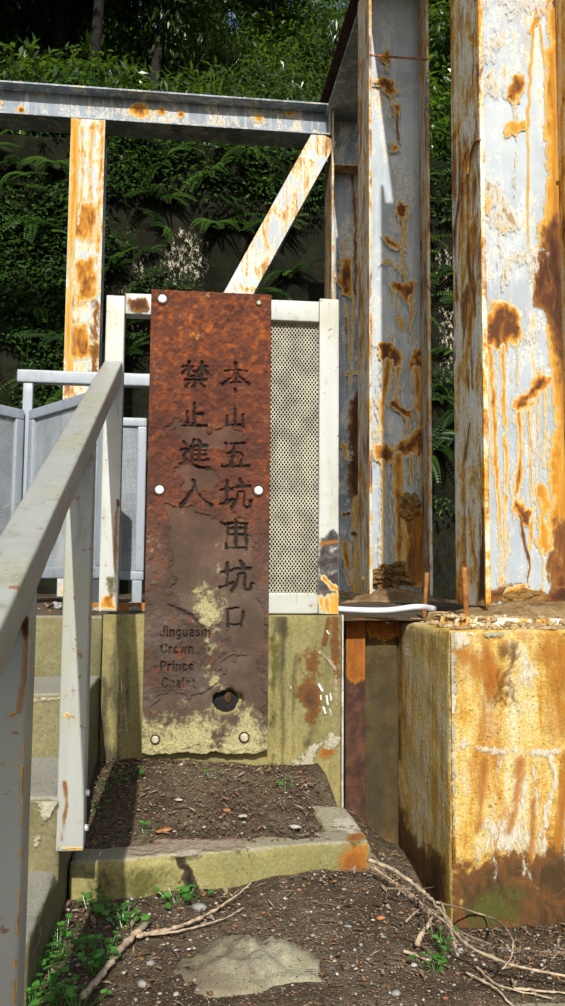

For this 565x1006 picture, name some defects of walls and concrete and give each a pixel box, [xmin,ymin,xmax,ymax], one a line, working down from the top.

corrosion [123,101,185,120]
corrosion [372,48,403,153]
corrosion [64,118,105,372]
corrosion [478,0,565,603]
corrosion [372,200,423,589]
corrosion [293,175,365,724]
corrosion [9,616,29,718]
corrosion [454,643,500,718]
crack [176,857,201,892]
leakage [399,738,565,928]
corrosion [507,757,524,833]
corrosion [555,753,565,846]